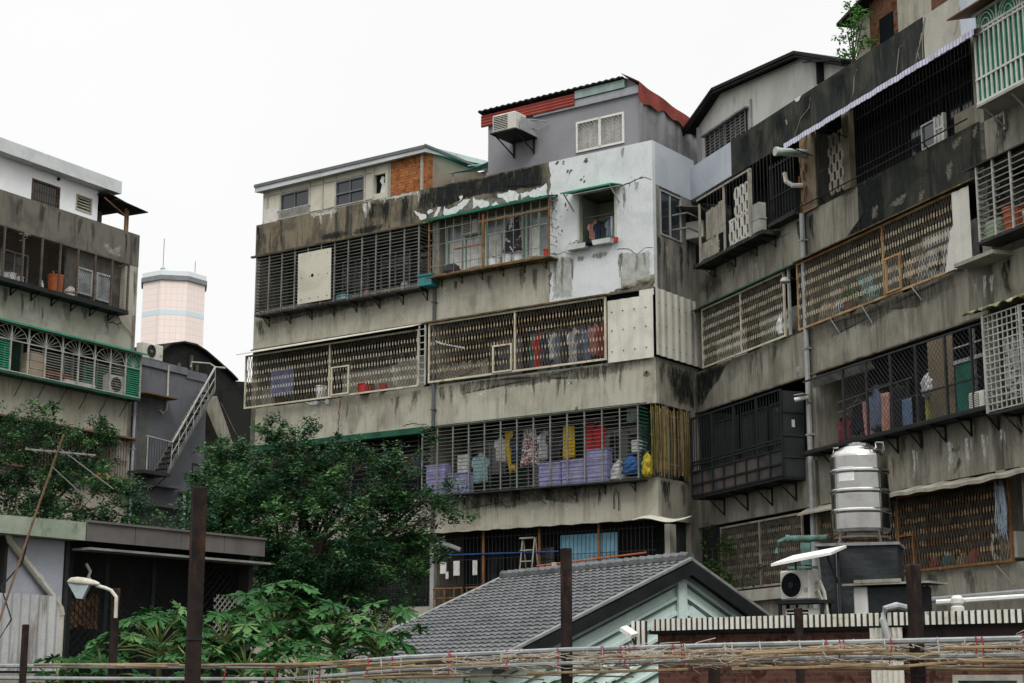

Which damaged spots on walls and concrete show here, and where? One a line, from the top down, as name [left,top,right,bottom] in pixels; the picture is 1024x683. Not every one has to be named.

damp [312,165,542,240]
peeling [414,161,585,294]
damp [552,257,573,300]
damp [439,364,622,411]
damp [660,364,725,406]
damp [453,486,603,524]
damp [661,481,685,508]